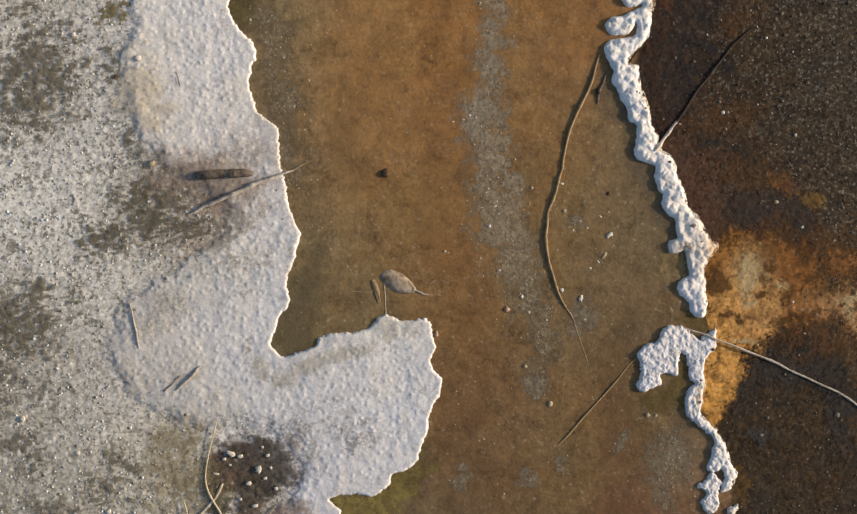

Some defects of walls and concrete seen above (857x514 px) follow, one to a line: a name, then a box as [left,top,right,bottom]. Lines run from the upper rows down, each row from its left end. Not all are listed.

spalling [235,0,317,199]
leakage [104,0,740,514]
spalling [454,0,598,402]
rust [701,219,857,428]